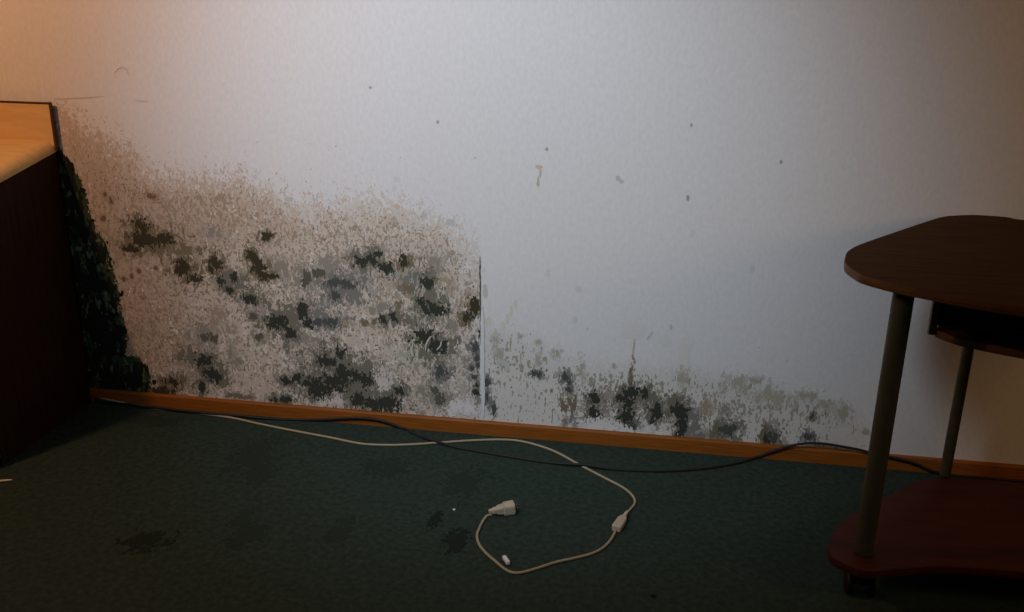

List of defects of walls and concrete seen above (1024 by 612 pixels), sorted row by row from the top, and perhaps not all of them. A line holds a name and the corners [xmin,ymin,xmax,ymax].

damp [40,95,872,451]